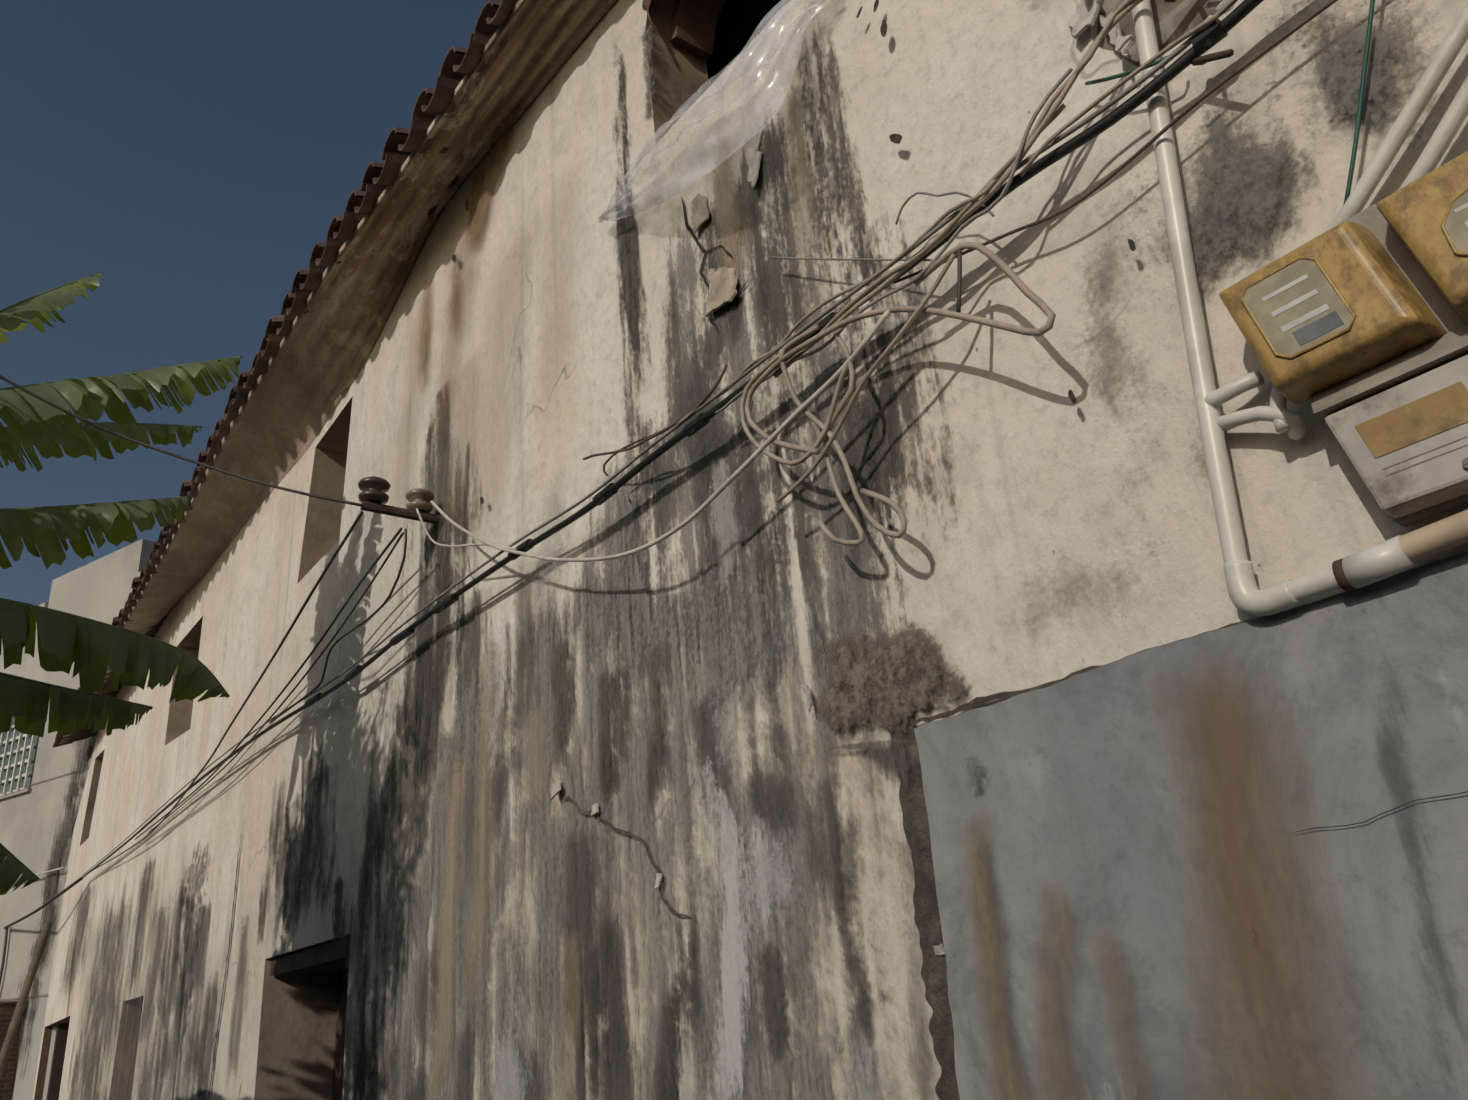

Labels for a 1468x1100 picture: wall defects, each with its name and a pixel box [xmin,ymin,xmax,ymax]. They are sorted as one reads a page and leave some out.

flaking render [1068,0,1140,67]
flaking render [1150,0,1223,52]
leakage [17,26,954,1100]
crack [1293,791,1468,833]